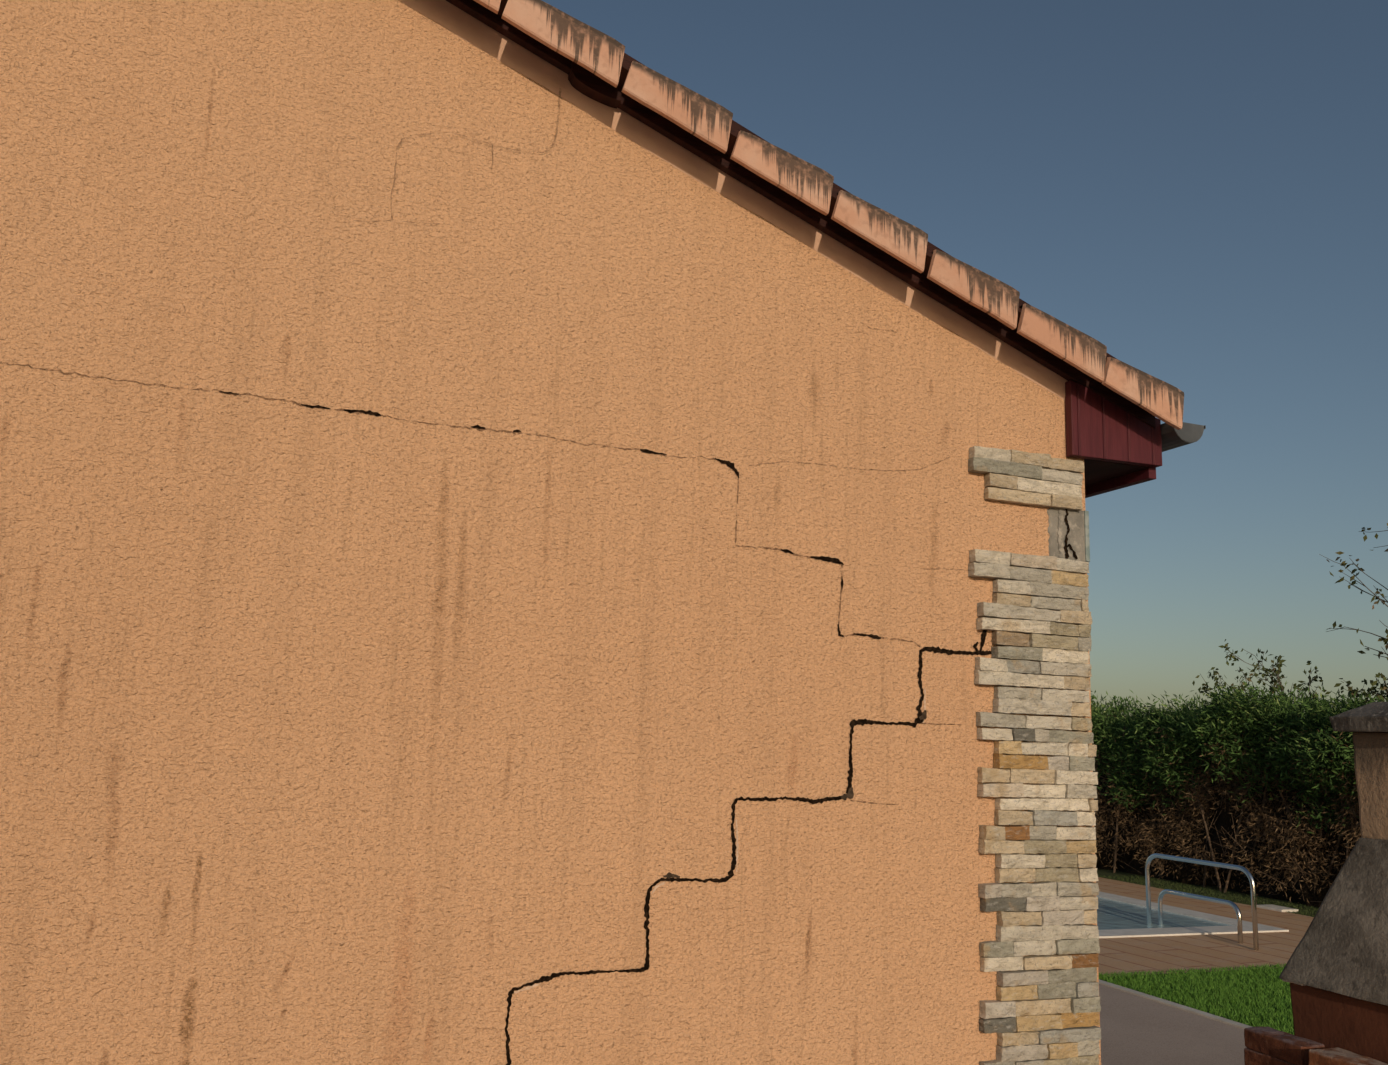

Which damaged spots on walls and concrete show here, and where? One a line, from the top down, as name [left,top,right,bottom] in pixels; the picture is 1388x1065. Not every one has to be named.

crack [6,363,992,1065]